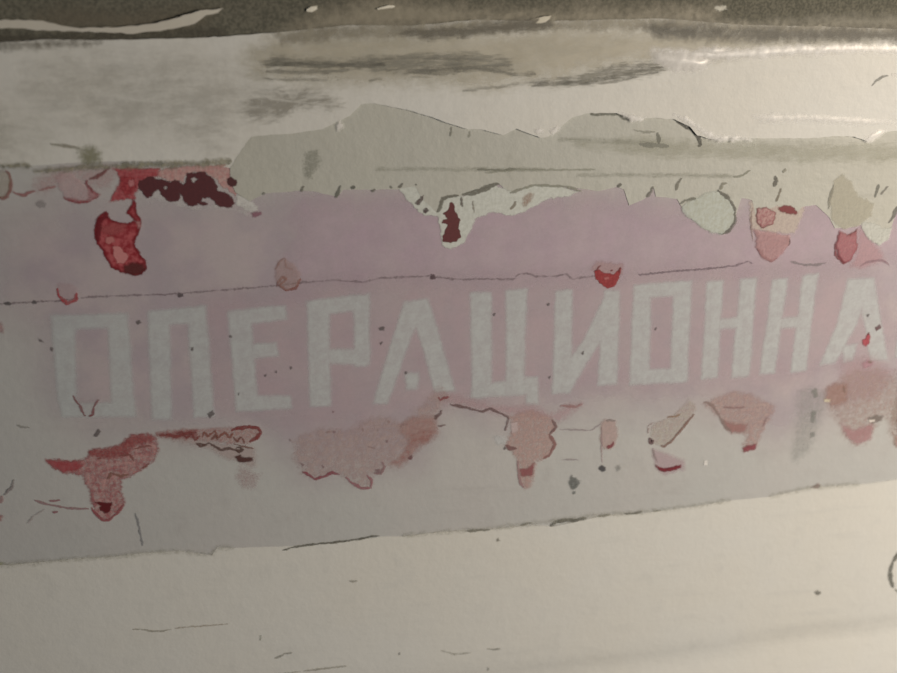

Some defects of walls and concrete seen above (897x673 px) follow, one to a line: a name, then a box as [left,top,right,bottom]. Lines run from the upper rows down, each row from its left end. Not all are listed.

flaking render [0,0,897,47]
peeling [94,103,897,276]
peeling [593,263,622,288]
peeling [290,394,558,489]
peeling [576,419,618,452]
peeling [648,403,694,472]
peeling [705,393,773,452]
crack [888,554,897,591]